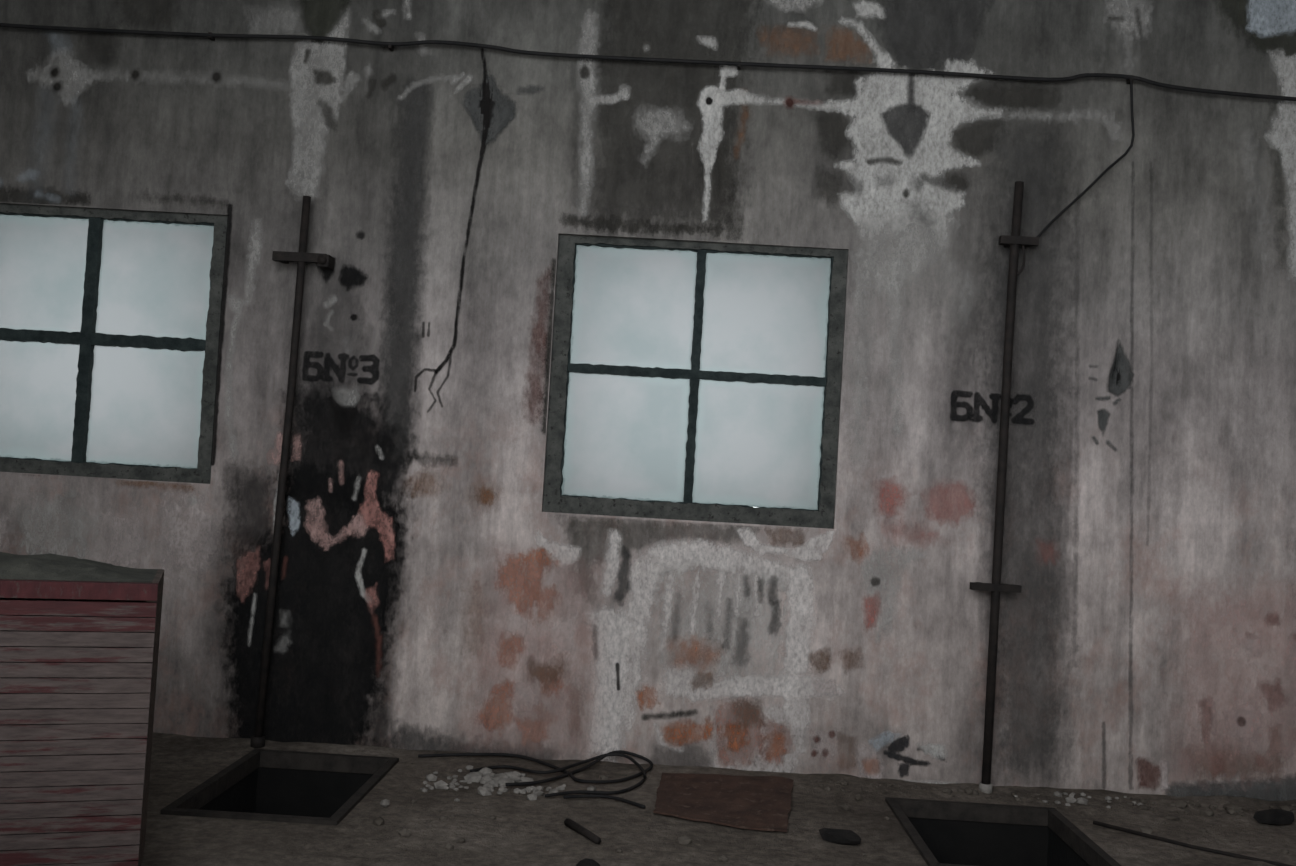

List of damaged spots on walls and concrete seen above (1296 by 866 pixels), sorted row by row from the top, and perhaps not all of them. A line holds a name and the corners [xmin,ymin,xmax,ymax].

water stain [292,0,349,188]
water stain [565,0,861,234]
water stain [881,0,993,155]
water stain [958,83,1058,156]
water stain [1221,0,1296,277]
peeling [272,433,301,463]
peeling [274,449,395,671]
peeling [499,548,558,665]
peeling [638,687,789,764]